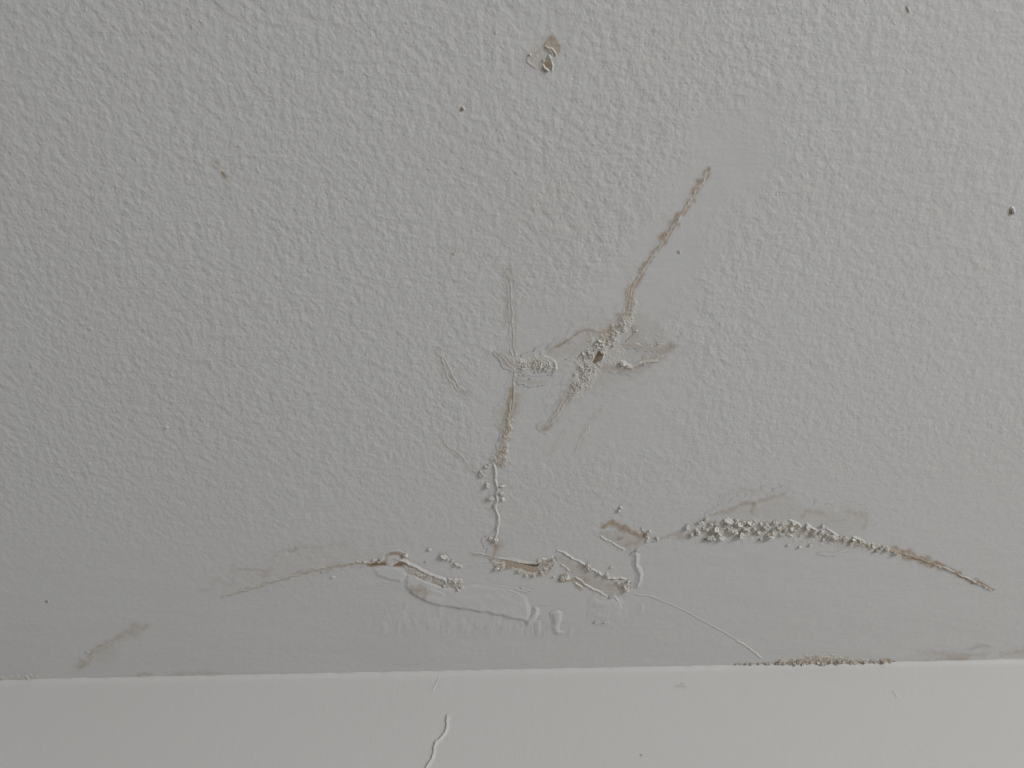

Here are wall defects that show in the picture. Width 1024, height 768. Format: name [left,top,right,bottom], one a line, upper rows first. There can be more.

spalling [521,32,563,77]
crack [434,166,713,558]
crack [220,548,465,599]
crack [652,517,996,592]
crack [631,591,895,666]
crack [423,713,452,768]